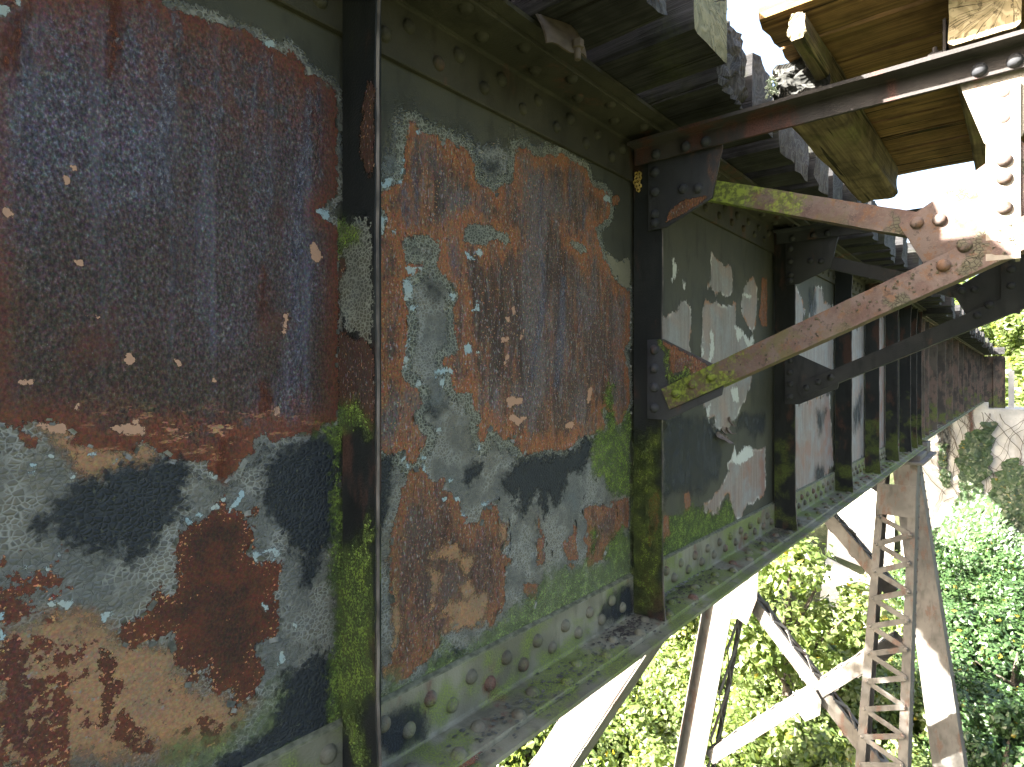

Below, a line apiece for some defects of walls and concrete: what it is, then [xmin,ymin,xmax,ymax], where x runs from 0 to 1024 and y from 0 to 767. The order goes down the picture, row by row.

peeling [0,0,21,17]
rust [665,195,707,223]
peeling [402,266,422,311]
peeling [663,251,759,364]
peeling [796,285,833,324]
rust [663,341,708,374]
peeling [799,339,834,369]
rust [0,0,633,767]
peeling [703,375,767,519]
peeling [796,394,834,490]
peeling [185,490,245,526]
peeling [47,597,74,610]